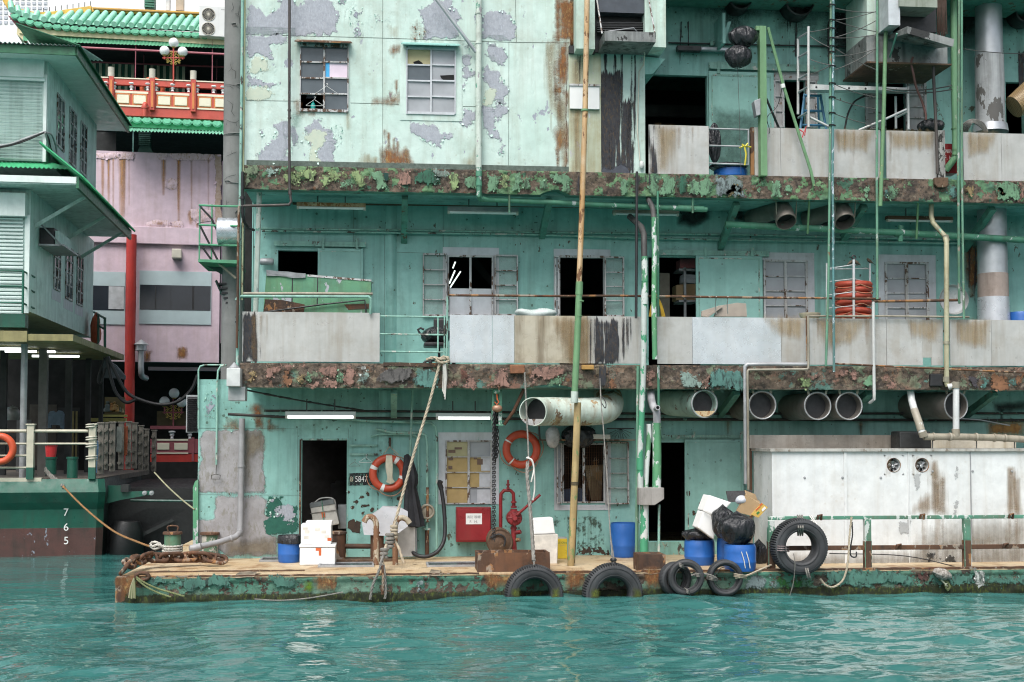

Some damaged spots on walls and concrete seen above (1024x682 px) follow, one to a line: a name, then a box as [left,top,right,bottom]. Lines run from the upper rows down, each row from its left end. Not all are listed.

peeling [231,0,383,99]
peeling [214,118,571,224]
corrosion [381,133,411,163]
peeling [410,0,517,156]
corrosion [554,0,579,165]
leakage [604,54,636,160]
peeling [647,174,744,198]
peeling [757,178,793,198]
peeling [995,181,1024,202]
leakage [622,318,631,356]
peeling [198,429,299,557]